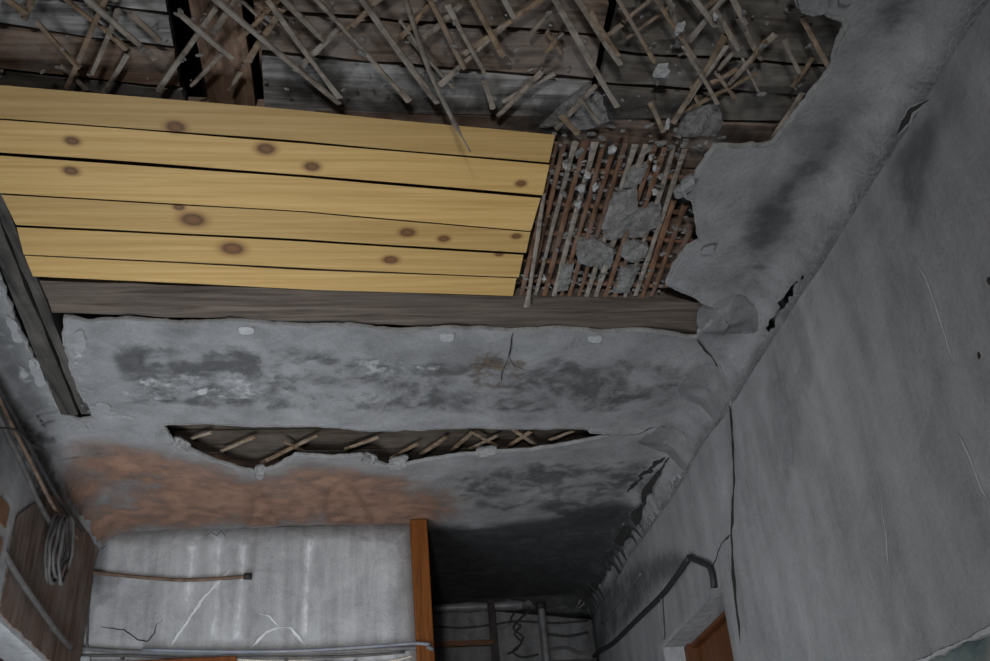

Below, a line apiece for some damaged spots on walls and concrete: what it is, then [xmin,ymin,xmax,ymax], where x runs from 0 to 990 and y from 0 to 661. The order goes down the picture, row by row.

flaking render [0,0,852,422]
flaking render [162,423,612,480]